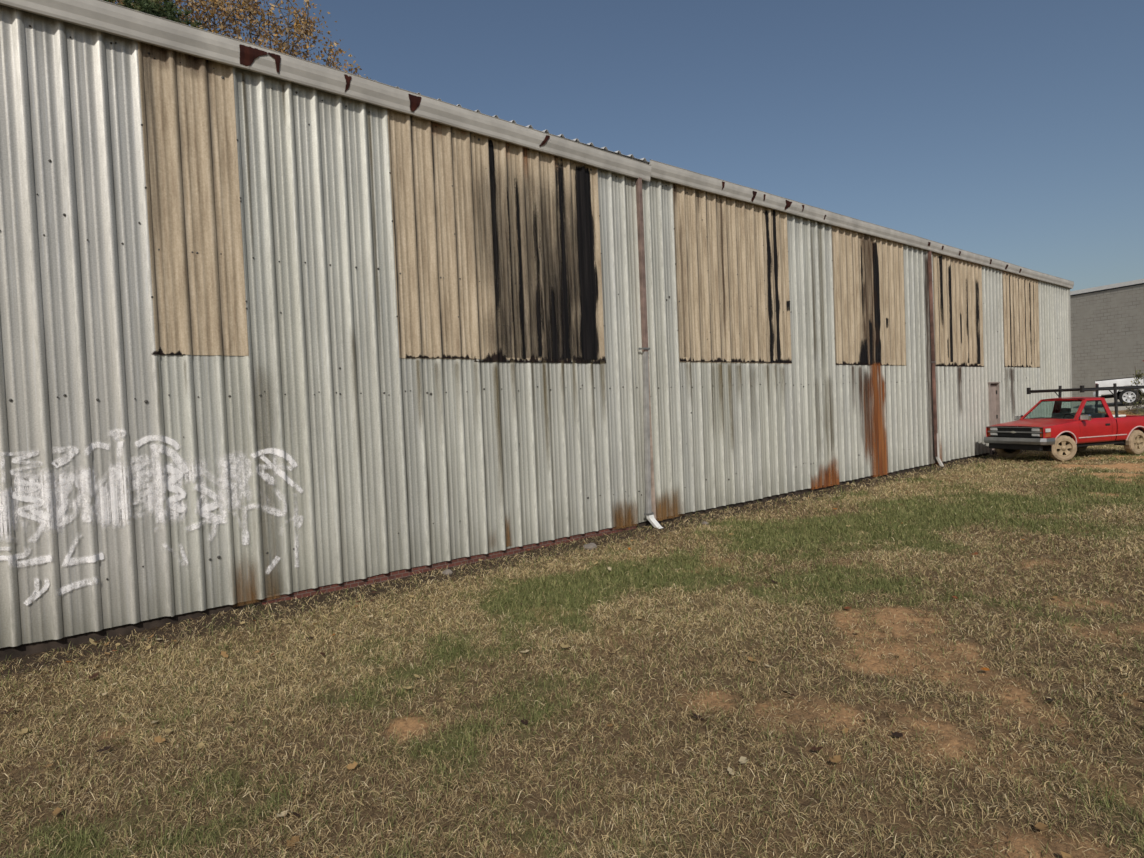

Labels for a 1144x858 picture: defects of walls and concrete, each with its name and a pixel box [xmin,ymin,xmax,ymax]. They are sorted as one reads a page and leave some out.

rust [239,44,281,72]
rust [408,94,421,112]
water stain [406,140,606,363]
water stain [680,210,792,363]
rust [852,236,888,477]
water stain [836,242,907,366]
water stain [936,255,984,367]
rust [811,386,839,490]